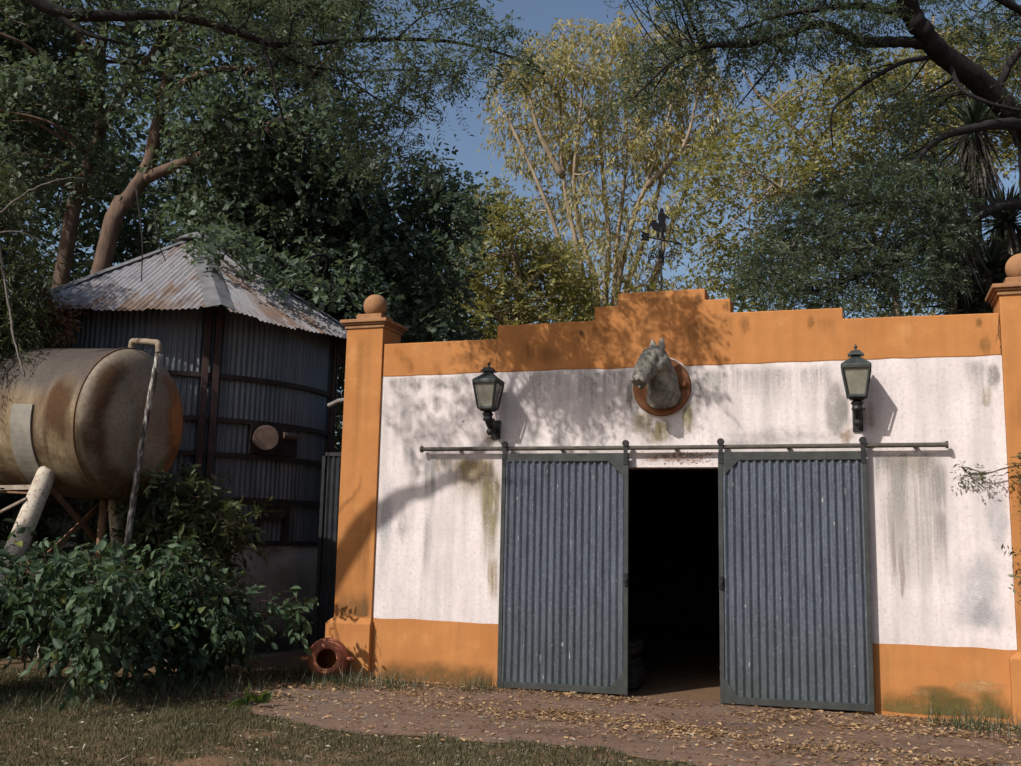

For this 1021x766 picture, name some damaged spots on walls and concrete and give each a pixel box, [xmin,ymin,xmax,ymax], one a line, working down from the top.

water stain [425,460,498,539]
water stain [876,455,946,554]